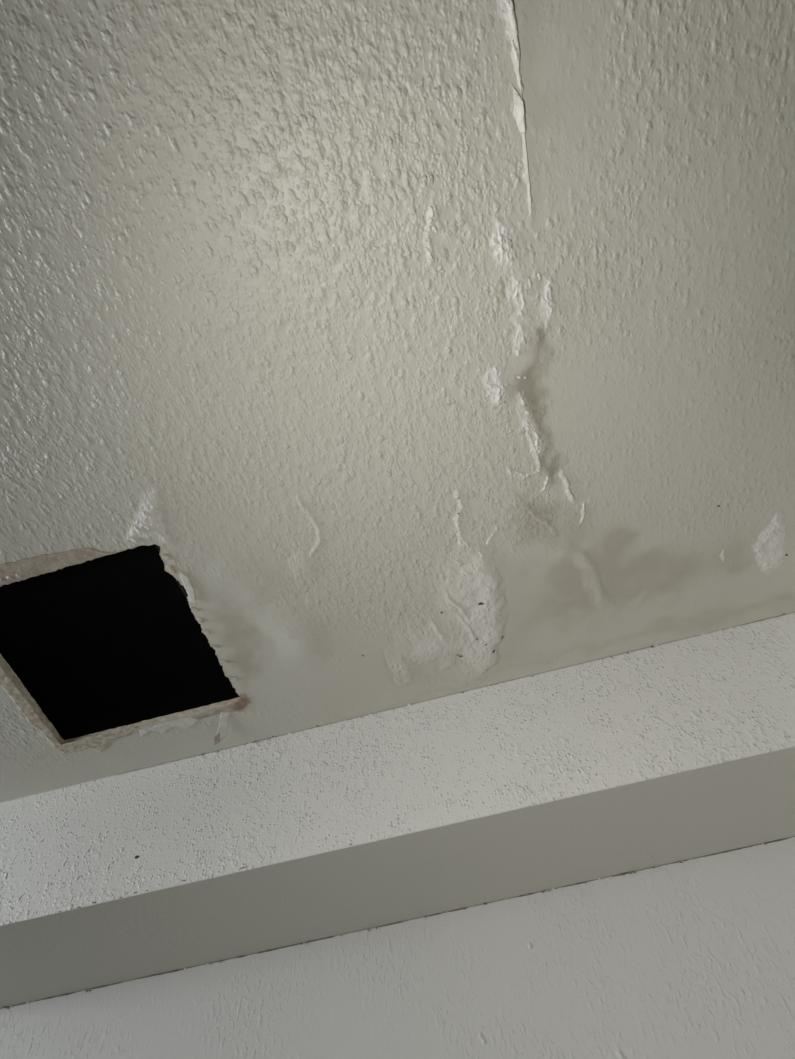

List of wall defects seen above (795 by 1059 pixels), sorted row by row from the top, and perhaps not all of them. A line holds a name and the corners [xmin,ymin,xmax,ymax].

crack [502,0,532,220]
peeling [482,362,545,456]
peeling [750,509,787,577]